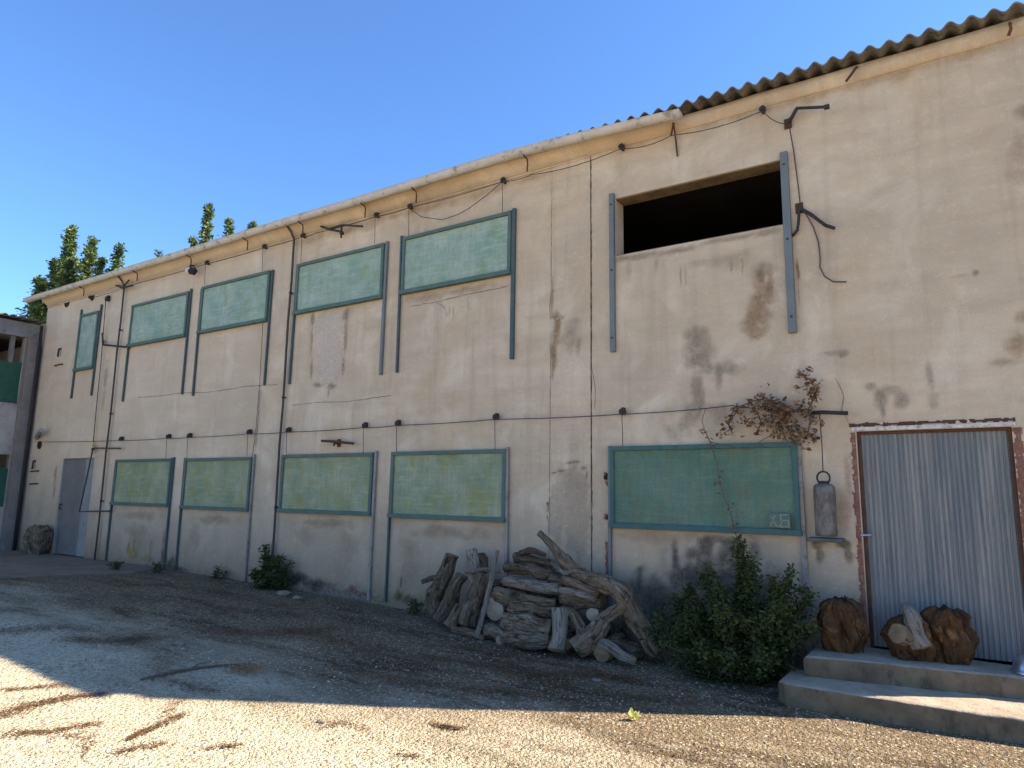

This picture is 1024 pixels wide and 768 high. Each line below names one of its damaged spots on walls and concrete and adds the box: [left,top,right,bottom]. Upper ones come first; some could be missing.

spalling [843,417,1024,643]